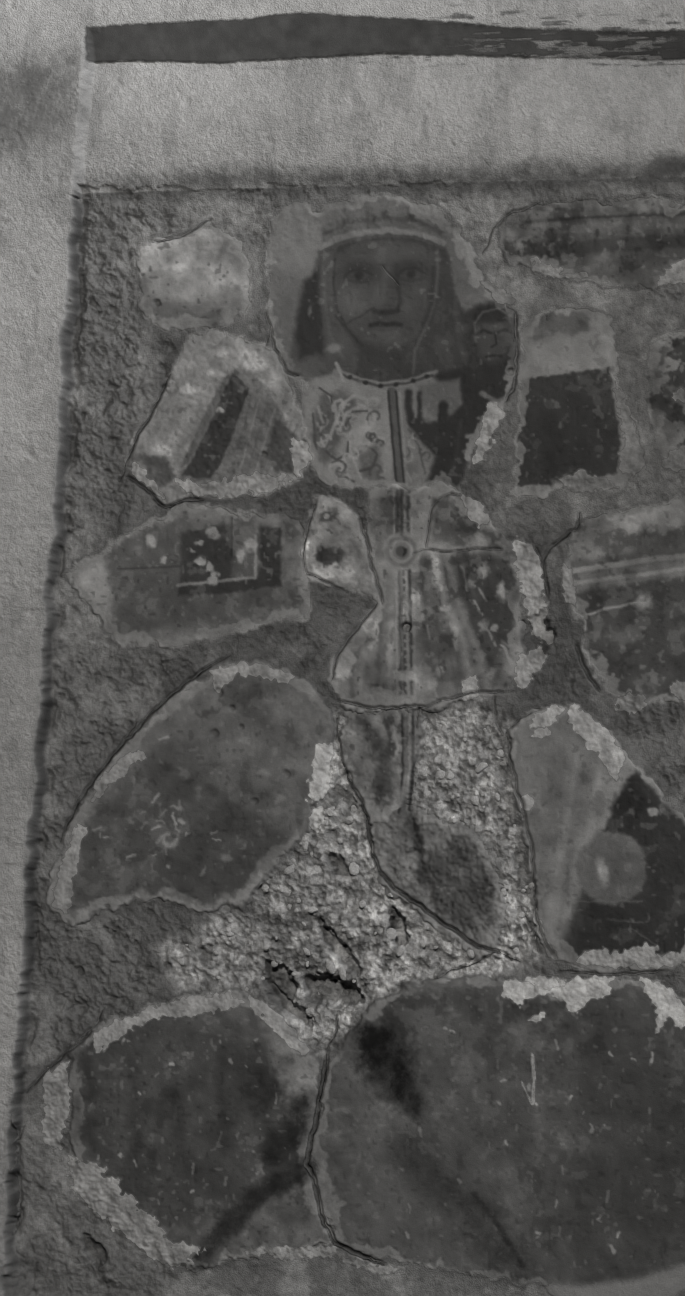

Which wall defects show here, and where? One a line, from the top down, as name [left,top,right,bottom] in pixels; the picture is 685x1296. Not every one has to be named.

peeling [472,402,505,464]
peeling [460,494,490,529]
peeling [512,540,556,689]
peeling [561,563,577,607]
peeling [209,661,295,693]
crack [303,503,669,979]
peeling [51,824,88,914]
spalling [91,675,685,1056]
crack [303,1014,384,1265]